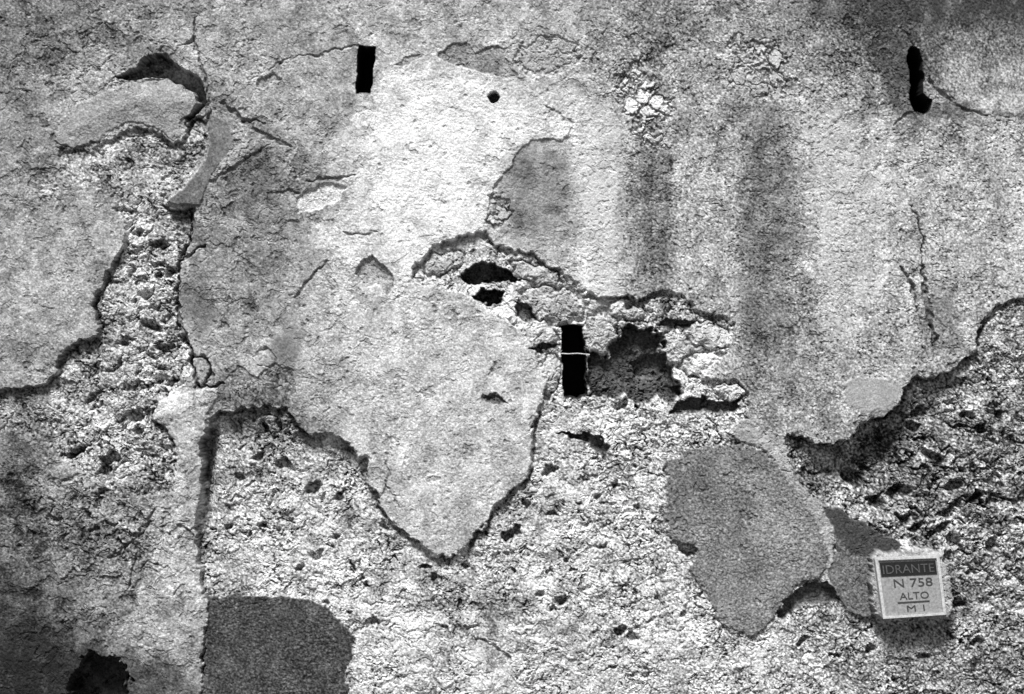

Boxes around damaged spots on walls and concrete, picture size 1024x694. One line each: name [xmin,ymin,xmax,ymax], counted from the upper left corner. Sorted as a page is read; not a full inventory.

crack [177,16,293,186]
crack [268,44,366,72]
peeling [614,59,677,155]
spalling [0,78,234,497]
crack [900,205,940,352]
spalling [195,192,1024,694]
hole [67,649,135,694]